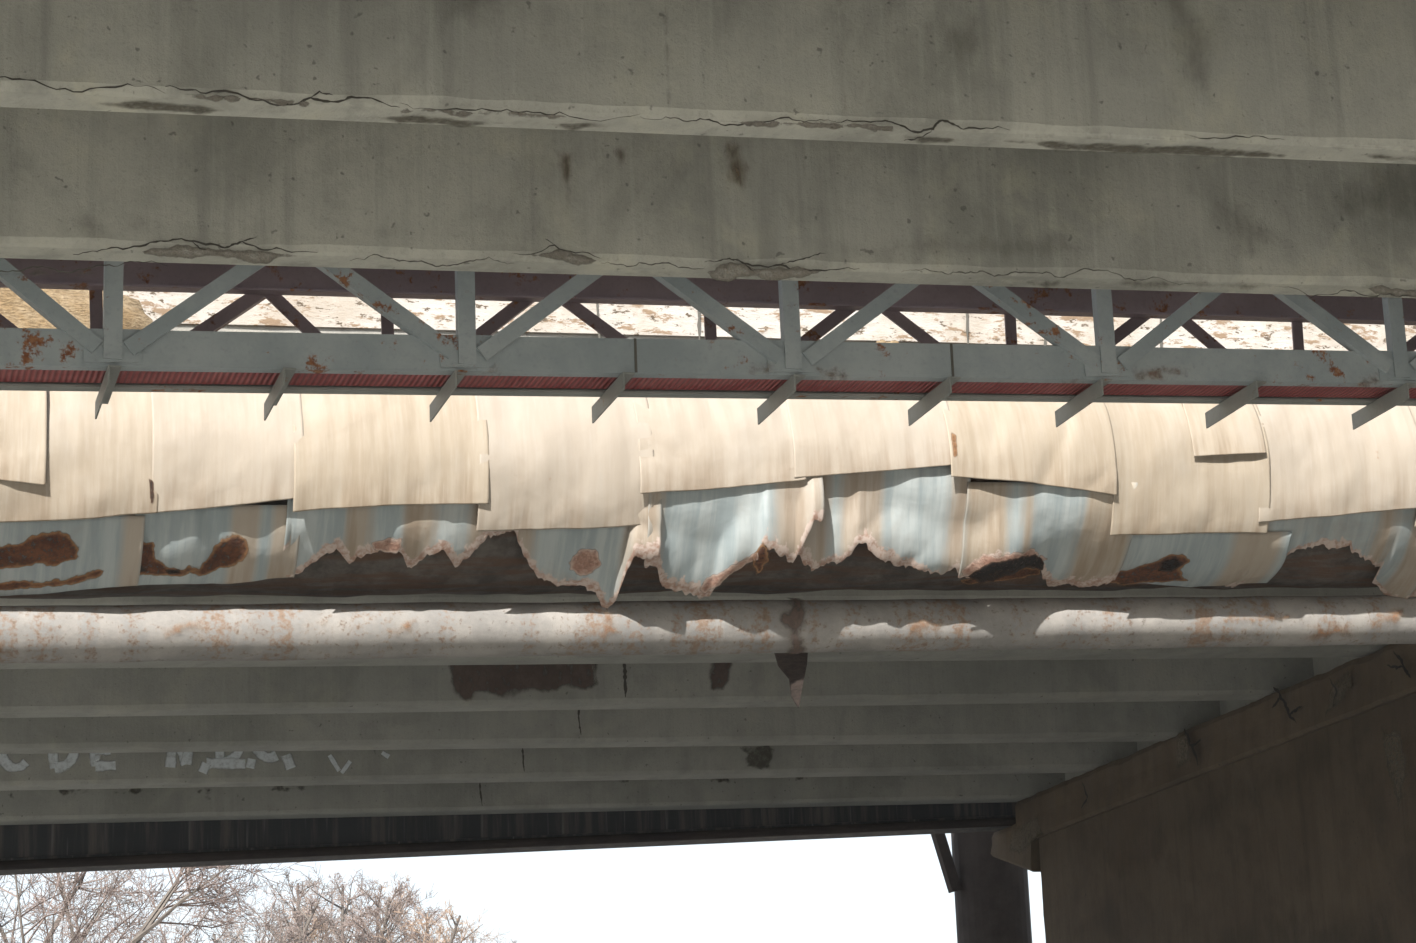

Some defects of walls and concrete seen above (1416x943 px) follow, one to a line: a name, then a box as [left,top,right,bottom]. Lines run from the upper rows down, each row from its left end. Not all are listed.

crack [0,76,1009,141]
crack [0,237,852,273]
crack [902,268,1190,285]
rust [0,531,103,590]
rust [140,535,248,577]
rust [960,548,1047,584]
rust [1110,554,1190,586]
rust [450,664,596,700]